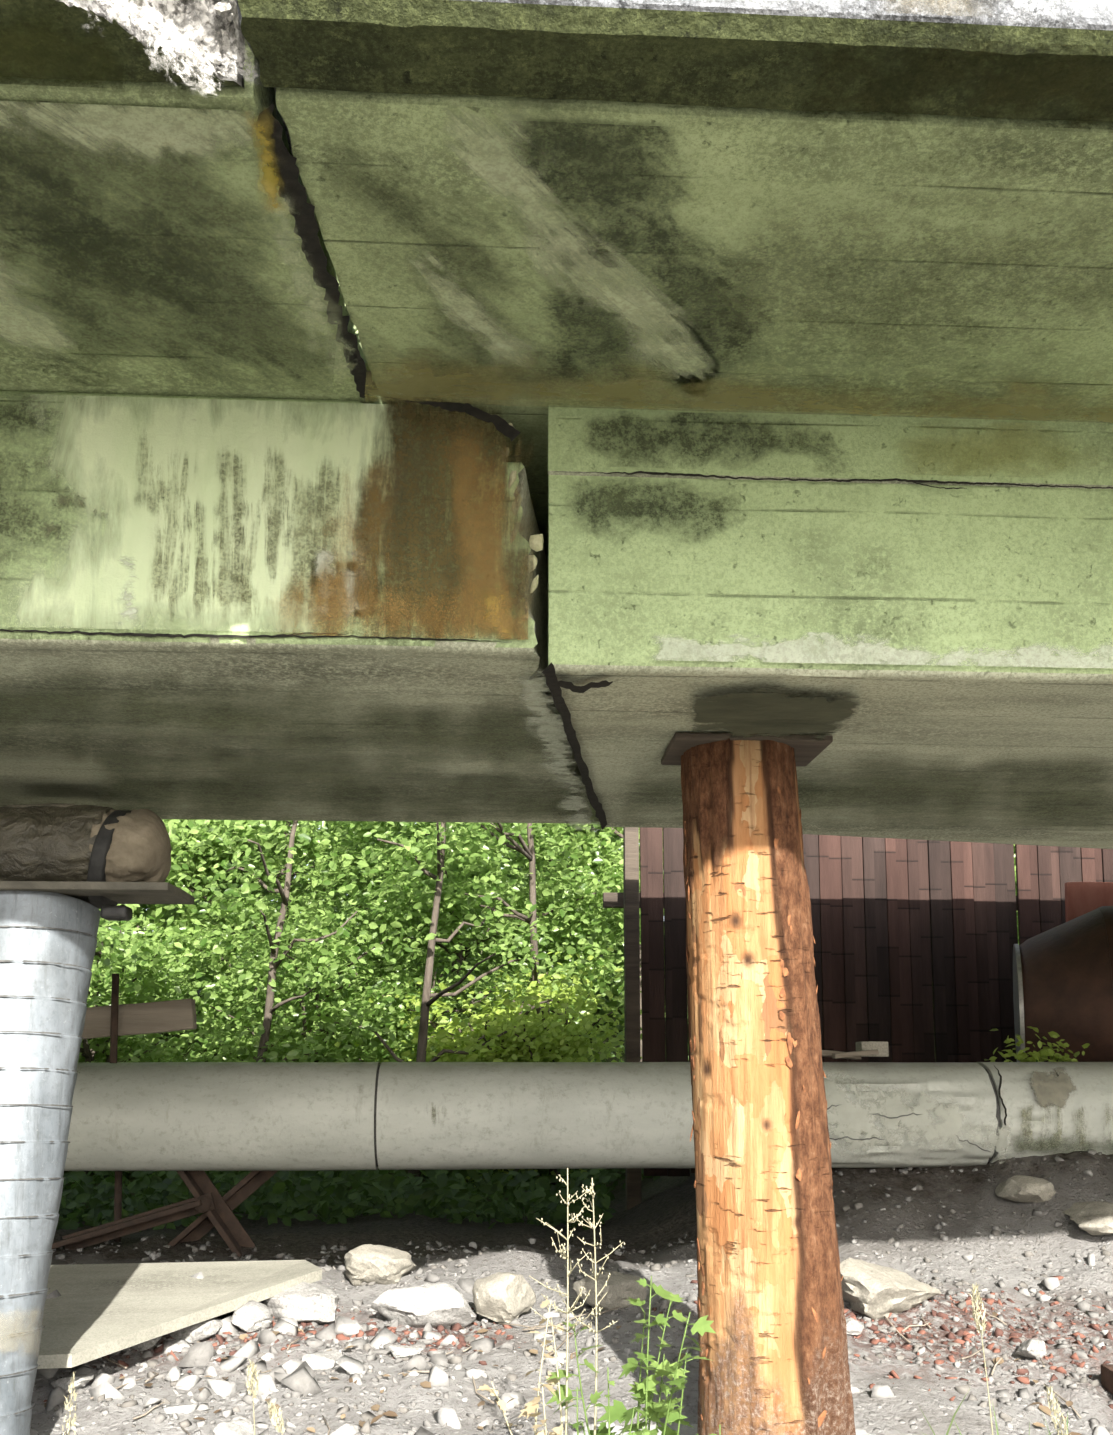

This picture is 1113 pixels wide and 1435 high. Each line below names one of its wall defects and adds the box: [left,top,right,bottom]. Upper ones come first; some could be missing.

spalling [100,0,256,87]
crack [256,103,521,442]
rust [284,400,534,640]
water stain [0,100,1113,632]
crack [555,471,1113,489]
crack [541,662,613,830]